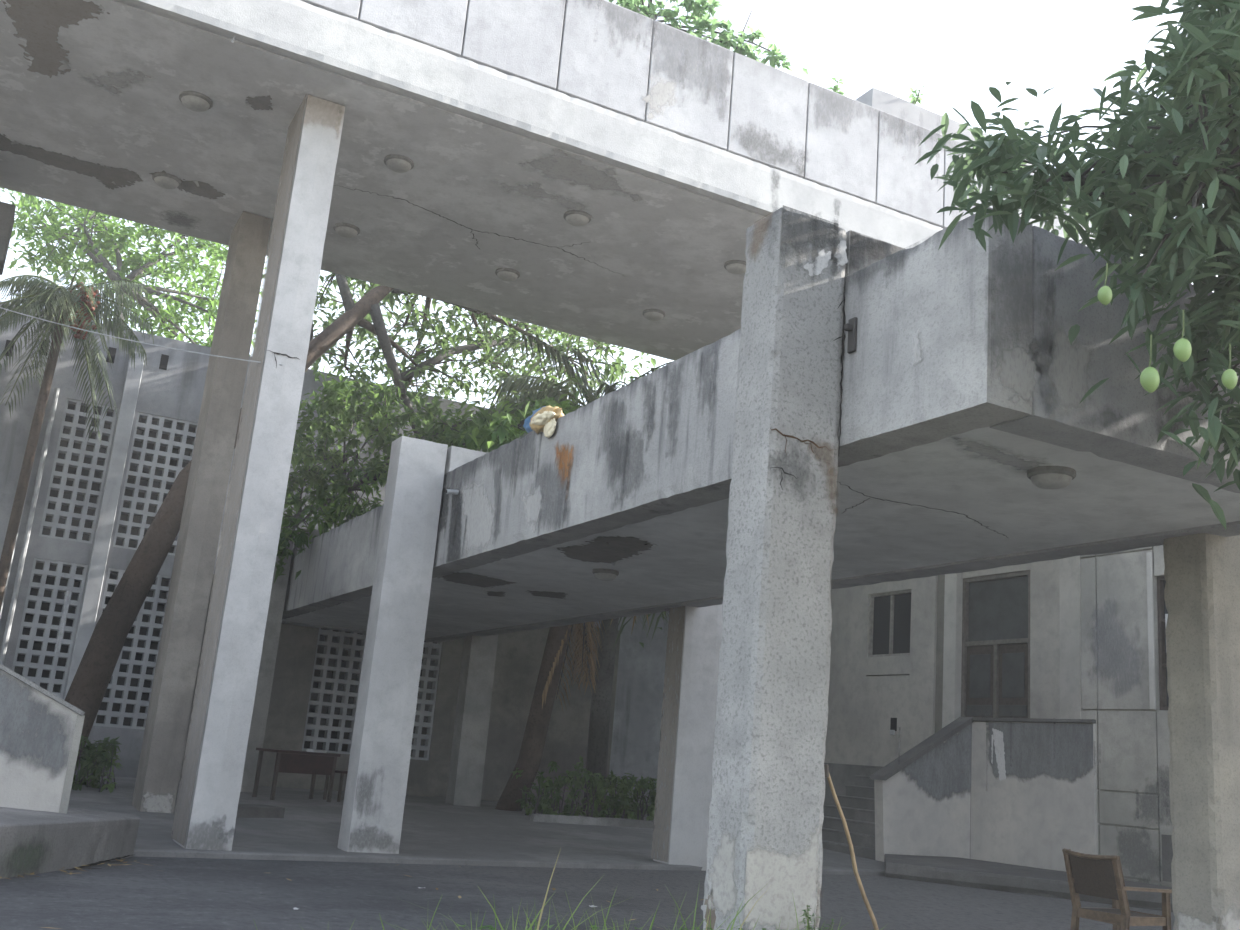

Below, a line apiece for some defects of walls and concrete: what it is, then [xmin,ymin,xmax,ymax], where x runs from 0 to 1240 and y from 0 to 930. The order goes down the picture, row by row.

peeling [3,0,110,78]
peeling [0,134,225,199]
crack [340,186,623,276]
spalling [803,240,848,276]
damp [774,204,890,278]
crack [770,271,1008,538]
damp [440,431,567,563]
rust [555,445,573,483]
peeling [557,536,652,566]
damp [56,592,70,650]
damp [0,669,68,774]
damp [899,716,1093,801]